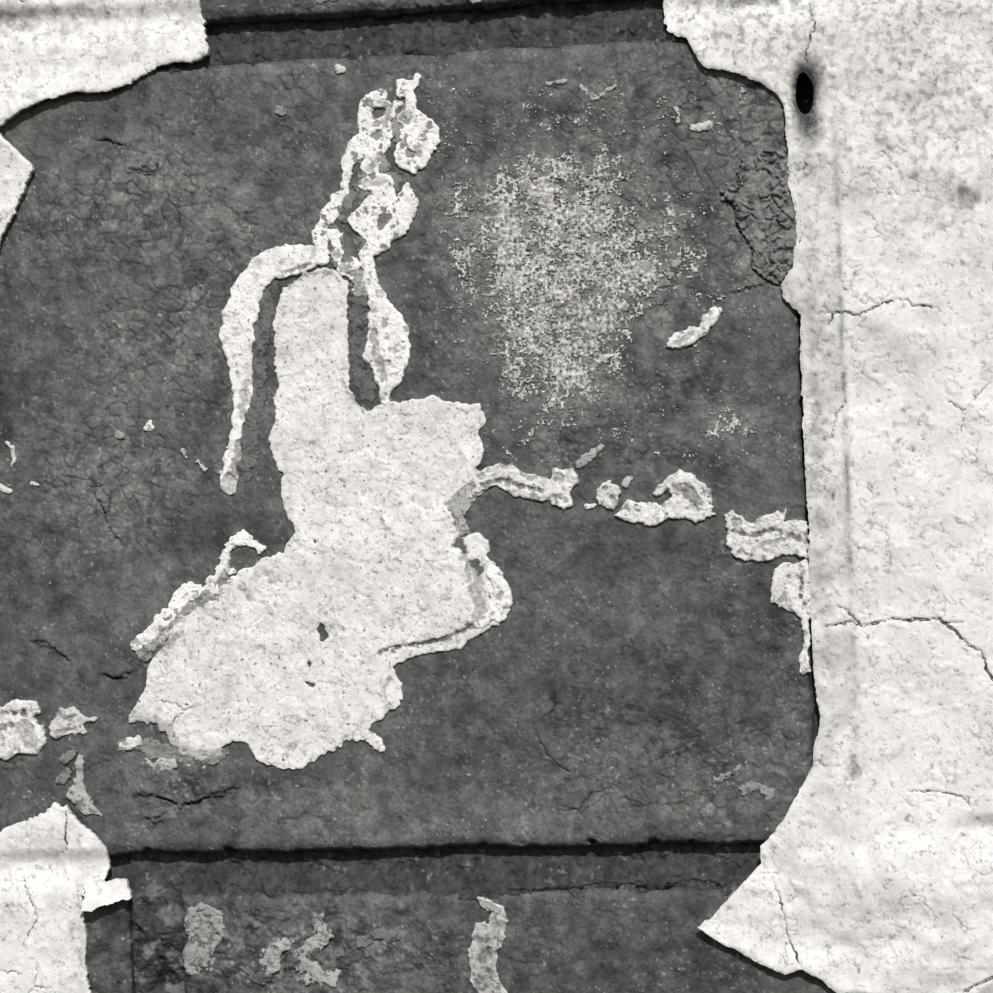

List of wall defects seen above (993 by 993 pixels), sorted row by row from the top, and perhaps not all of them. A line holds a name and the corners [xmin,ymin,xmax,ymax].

peeling [0,0,210,245]
crack [719,147,801,294]
crack [823,299,940,326]
peeling [117,73,736,782]
peeling [584,0,993,993]
crack [823,606,993,681]
peeling [0,699,98,761]
crack [62,811,70,851]
peeling [0,749,132,993]
peeling [467,896,509,993]
crack [773,884,800,965]
crack [964,976,993,992]